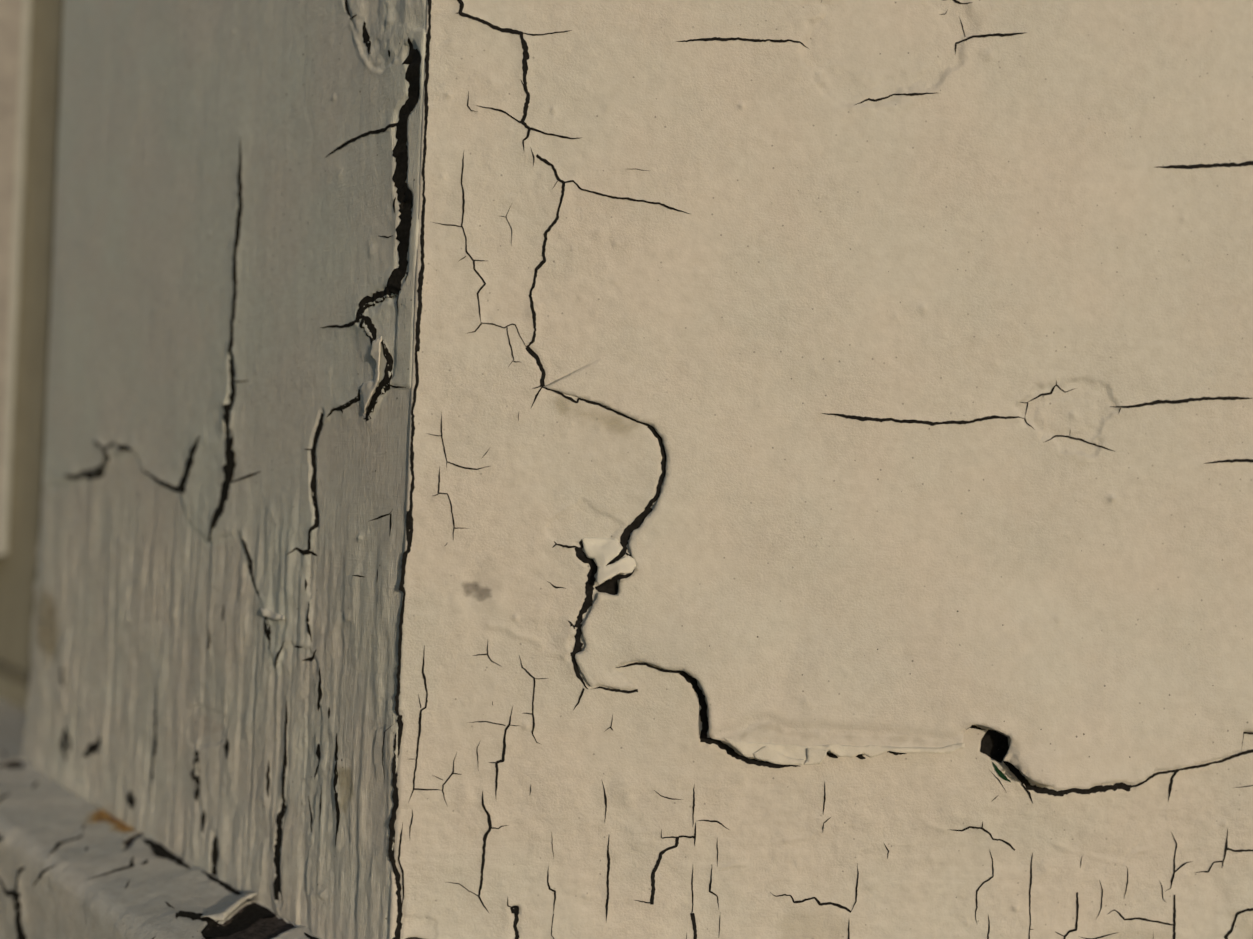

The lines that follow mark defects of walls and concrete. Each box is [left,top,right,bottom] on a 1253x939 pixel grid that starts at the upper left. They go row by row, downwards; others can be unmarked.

peeling [349,0,427,72]
crack [1157,161,1253,169]
peeling [0,336,411,939]
crack [0,0,906,939]
peeling [544,357,1253,790]
crack [821,380,1116,452]
crack [1111,396,1252,413]
crack [950,725,1253,939]